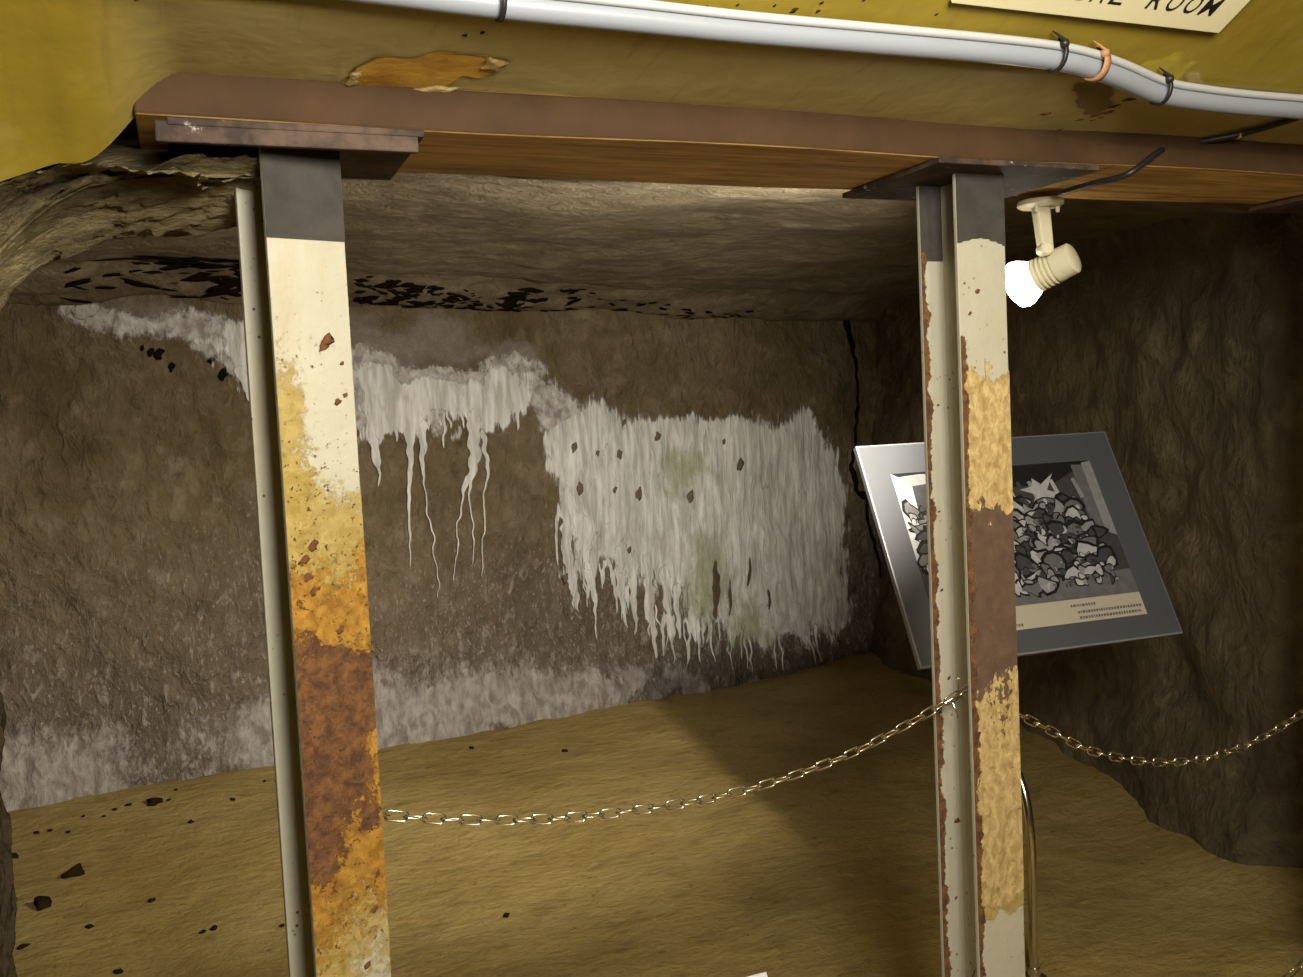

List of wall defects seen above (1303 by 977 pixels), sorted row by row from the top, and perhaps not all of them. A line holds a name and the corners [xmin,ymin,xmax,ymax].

peeling [342,51,510,92]
water stain [0,719,156,812]
water stain [58,303,249,401]
water stain [167,692,274,776]
corrosion [276,340,391,977]
water stain [350,323,861,750]
corrosion [921,252,952,977]
corrosion [961,336,1024,977]